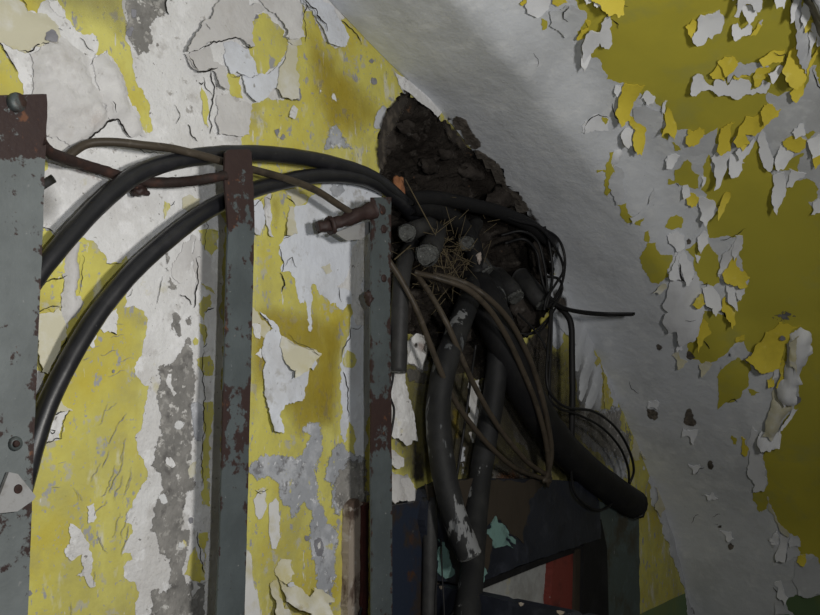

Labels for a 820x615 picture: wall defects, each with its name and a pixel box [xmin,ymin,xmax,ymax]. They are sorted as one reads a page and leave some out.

peeling [0,0,116,94]
peeling [42,0,362,251]
spalling [374,73,537,222]
peeling [520,0,628,71]
peeling [46,401,73,444]
peeling [36,164,224,395]
peeling [64,214,226,615]
peeling [249,183,382,615]
spalling [390,204,693,615]
peeling [582,0,820,598]
peeling [245,551,262,615]